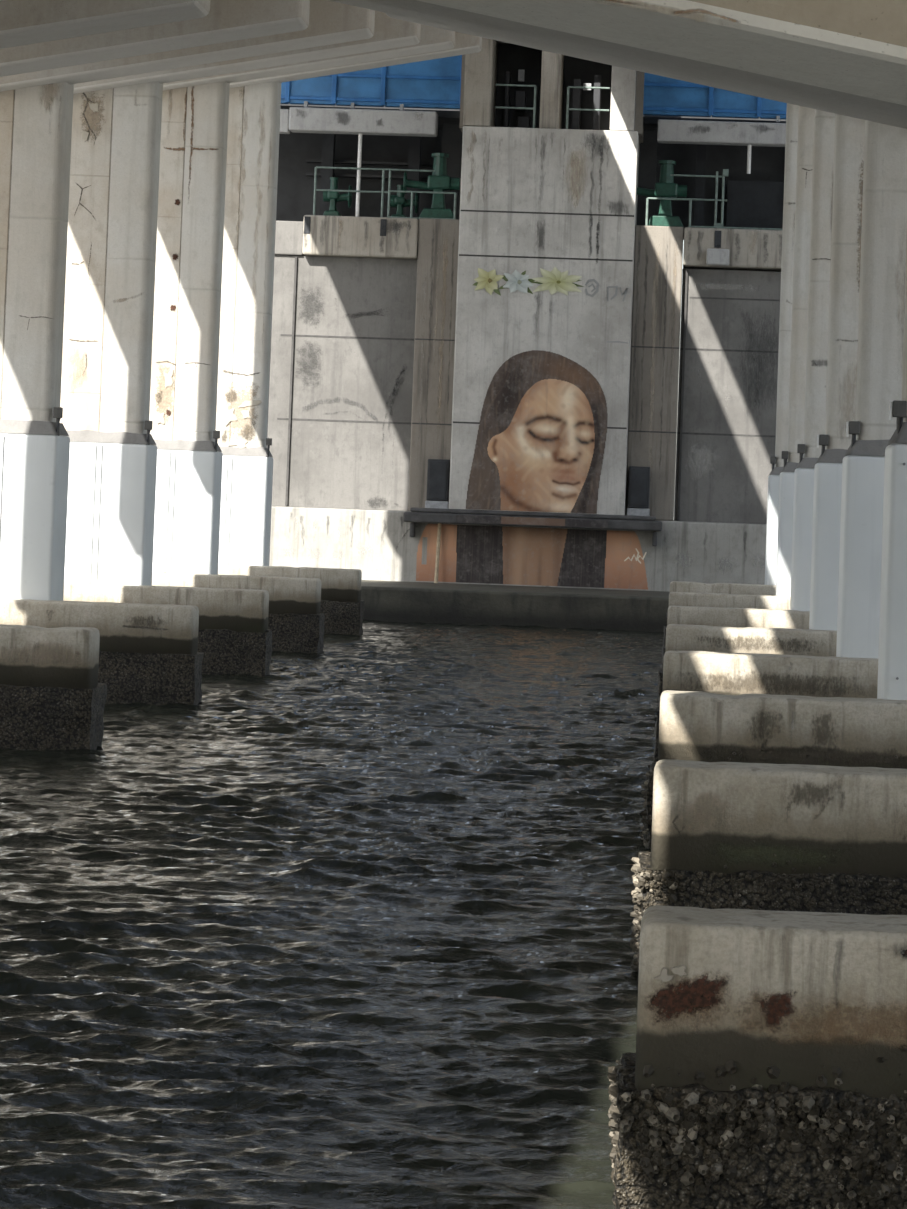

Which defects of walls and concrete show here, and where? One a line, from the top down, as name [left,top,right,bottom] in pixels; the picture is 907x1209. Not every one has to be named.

spalling [222,370,262,449]
water stain [791,783,829,817]
corrosion [648,965,727,1022]
corrosion [738,992,796,1031]